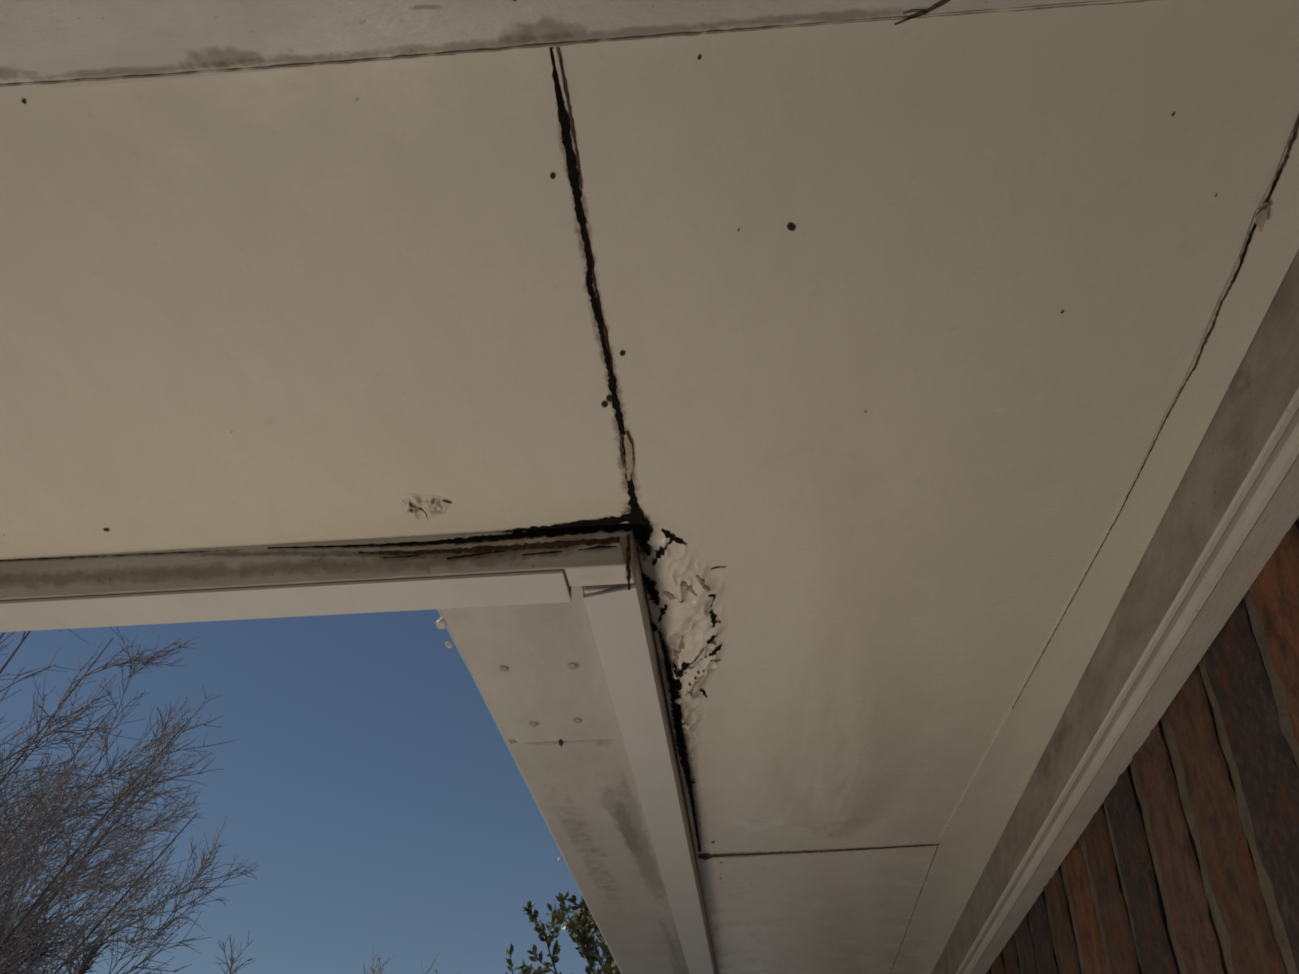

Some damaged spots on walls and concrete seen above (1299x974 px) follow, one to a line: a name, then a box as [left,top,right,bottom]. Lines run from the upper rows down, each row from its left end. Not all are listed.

peeling [447,550,562,560]
crack [0,0,1152,508]
peeling [639,523,731,834]
crack [1012,117,1299,709]